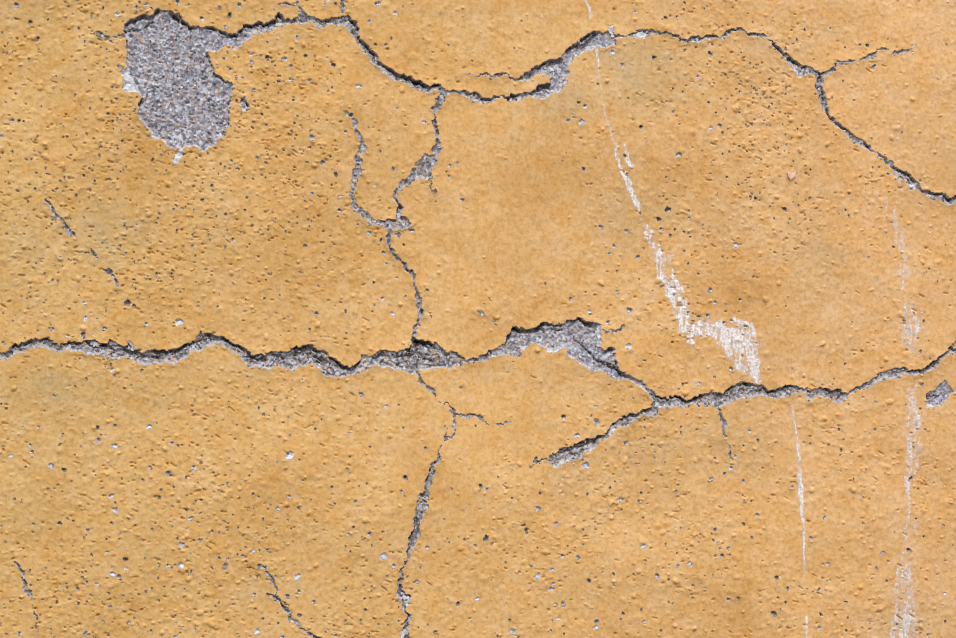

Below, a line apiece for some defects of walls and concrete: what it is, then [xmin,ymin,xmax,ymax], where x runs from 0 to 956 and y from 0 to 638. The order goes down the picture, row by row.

flaking render [0,0,342,260]
water stain [612,138,640,212]
crack [615,27,956,206]
crack [0,0,532,638]
flaking render [497,310,651,402]
crack [602,324,625,334]
water stain [644,224,762,383]
crack [529,341,956,469]
water stain [902,304,922,354]
flaking render [919,380,954,410]
water stain [889,496,918,638]